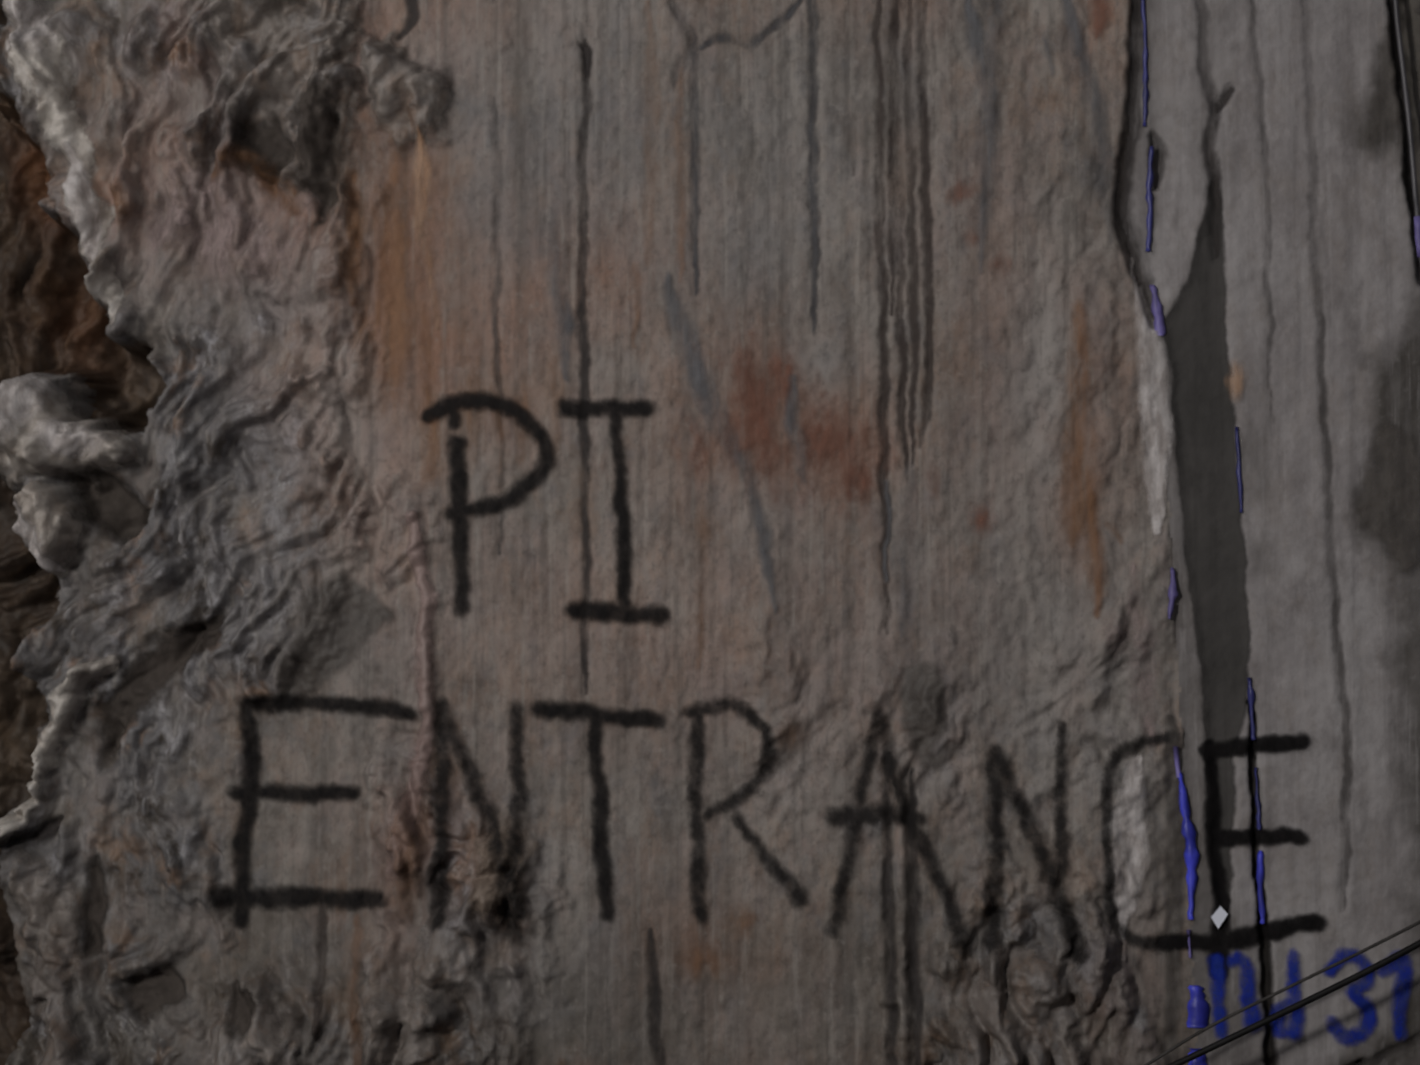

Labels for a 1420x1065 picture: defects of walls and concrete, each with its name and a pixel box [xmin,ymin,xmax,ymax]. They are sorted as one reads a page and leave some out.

crack [1113,0,1163,326]